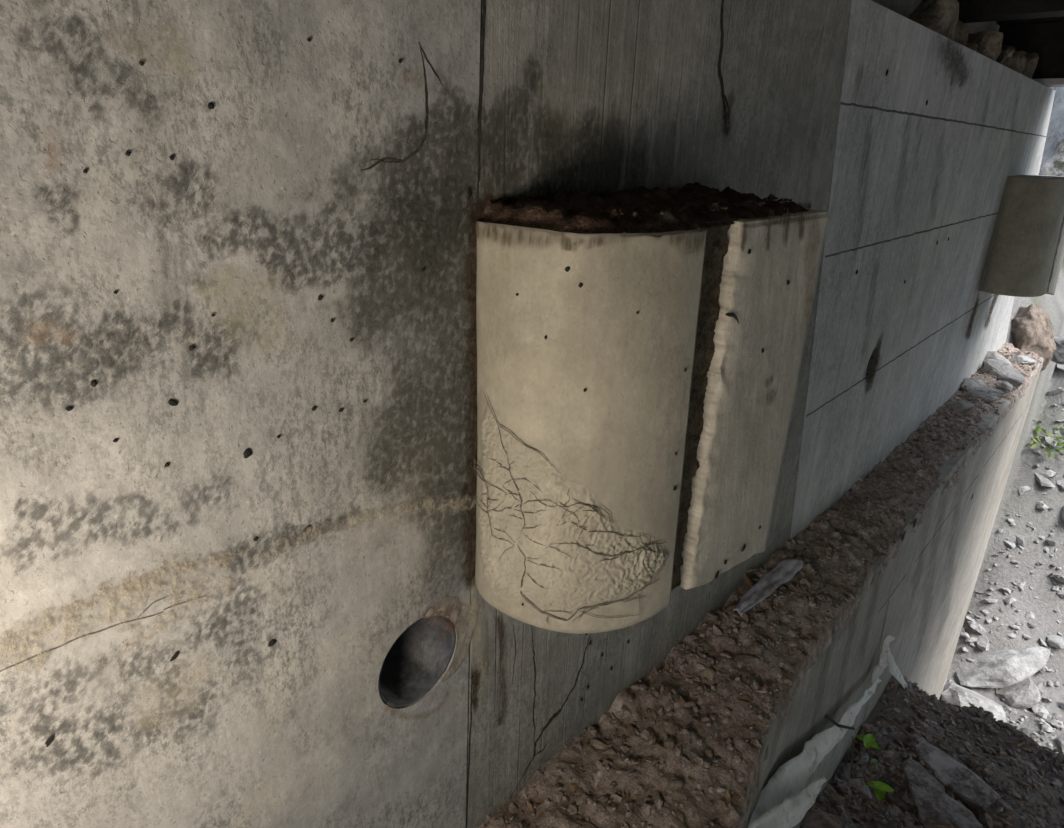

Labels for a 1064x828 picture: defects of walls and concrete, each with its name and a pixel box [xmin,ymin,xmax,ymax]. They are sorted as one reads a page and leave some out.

crack [359,42,443,172]
crack [717,0,729,135]
water stain [0,61,643,678]
water stain [30,677,122,770]
crack [0,595,206,672]
water stain [497,617,505,725]
crack [473,394,667,799]